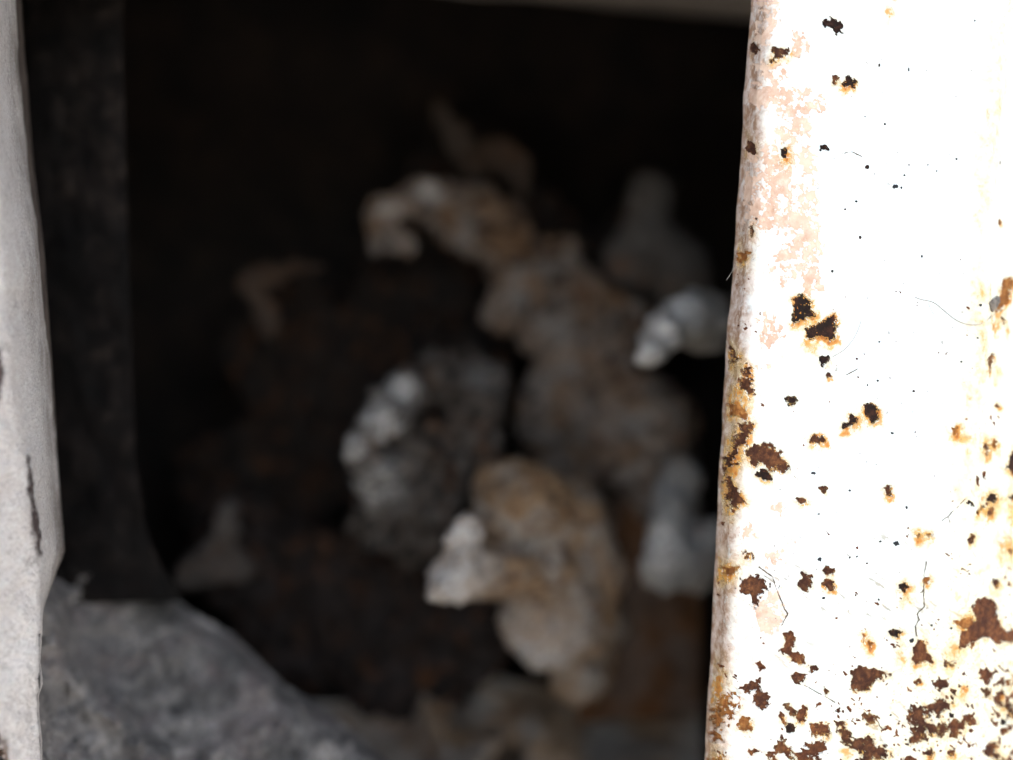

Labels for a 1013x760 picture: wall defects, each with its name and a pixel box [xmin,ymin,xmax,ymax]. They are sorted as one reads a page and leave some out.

peeling [742,0,834,298]
peeling [753,311,788,349]
corrosion [789,293,841,382]
corrosion [981,277,1013,376]
corrosion [721,345,798,526]
corrosion [801,403,883,449]
corrosion [949,418,970,453]
corrosion [717,550,771,608]
corrosion [747,428,1013,760]
corrosion [707,661,771,760]